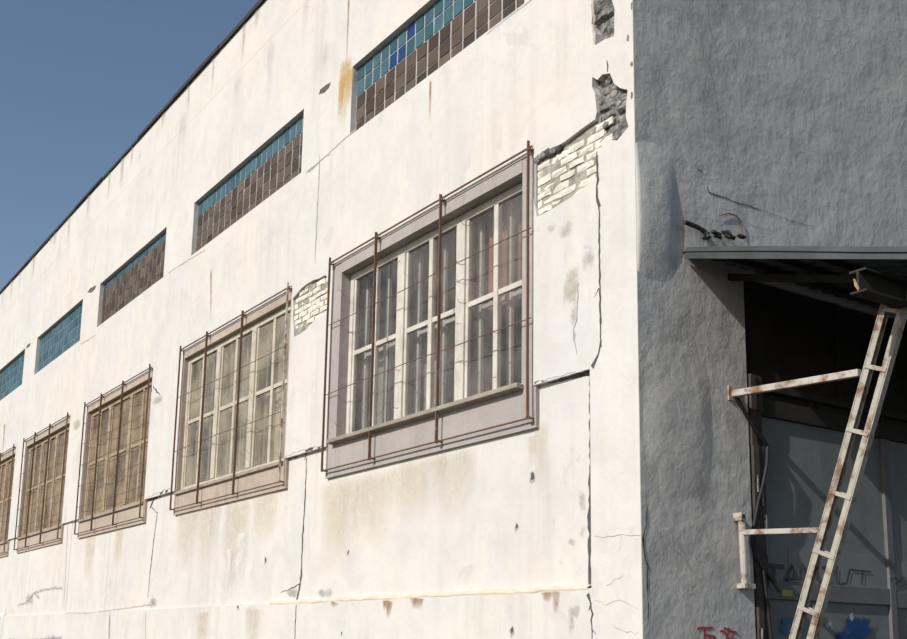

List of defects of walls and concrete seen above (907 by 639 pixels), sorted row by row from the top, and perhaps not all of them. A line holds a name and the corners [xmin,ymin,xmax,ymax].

rust [339,64,353,92]
flaking render [534,74,633,215]
spalling [591,0,615,41]
crack [683,0,809,229]
flaking render [294,277,328,336]
crack [573,152,602,368]
crack [17,488,173,639]
crack [282,457,307,639]
crack [586,507,651,634]